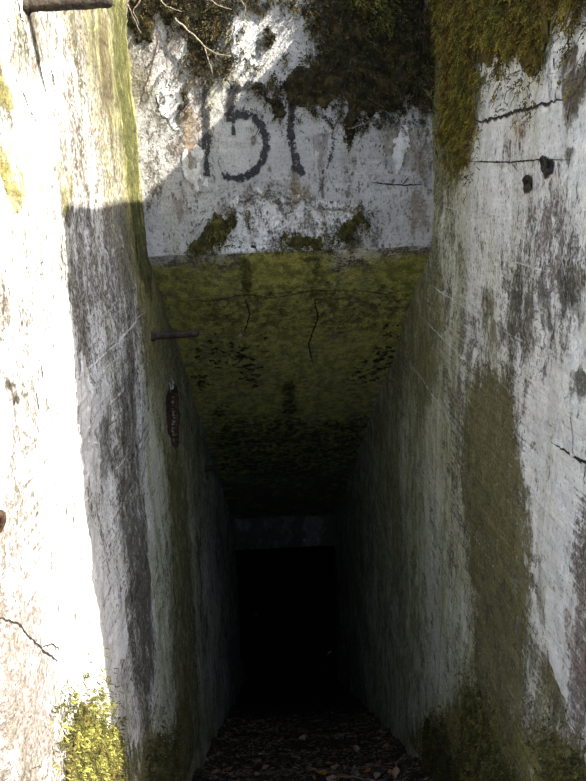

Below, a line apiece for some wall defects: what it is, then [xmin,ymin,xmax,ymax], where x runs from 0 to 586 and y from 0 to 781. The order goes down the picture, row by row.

rust [22,0,113,85]
peeling [231,21,261,66]
peeling [156,82,185,131]
crack [475,99,571,125]
peeling [182,144,208,193]
peeling [392,125,411,175]
crack [469,159,570,172]
crack [184,289,404,367]
crack [550,441,586,479]
crack [0,617,59,663]